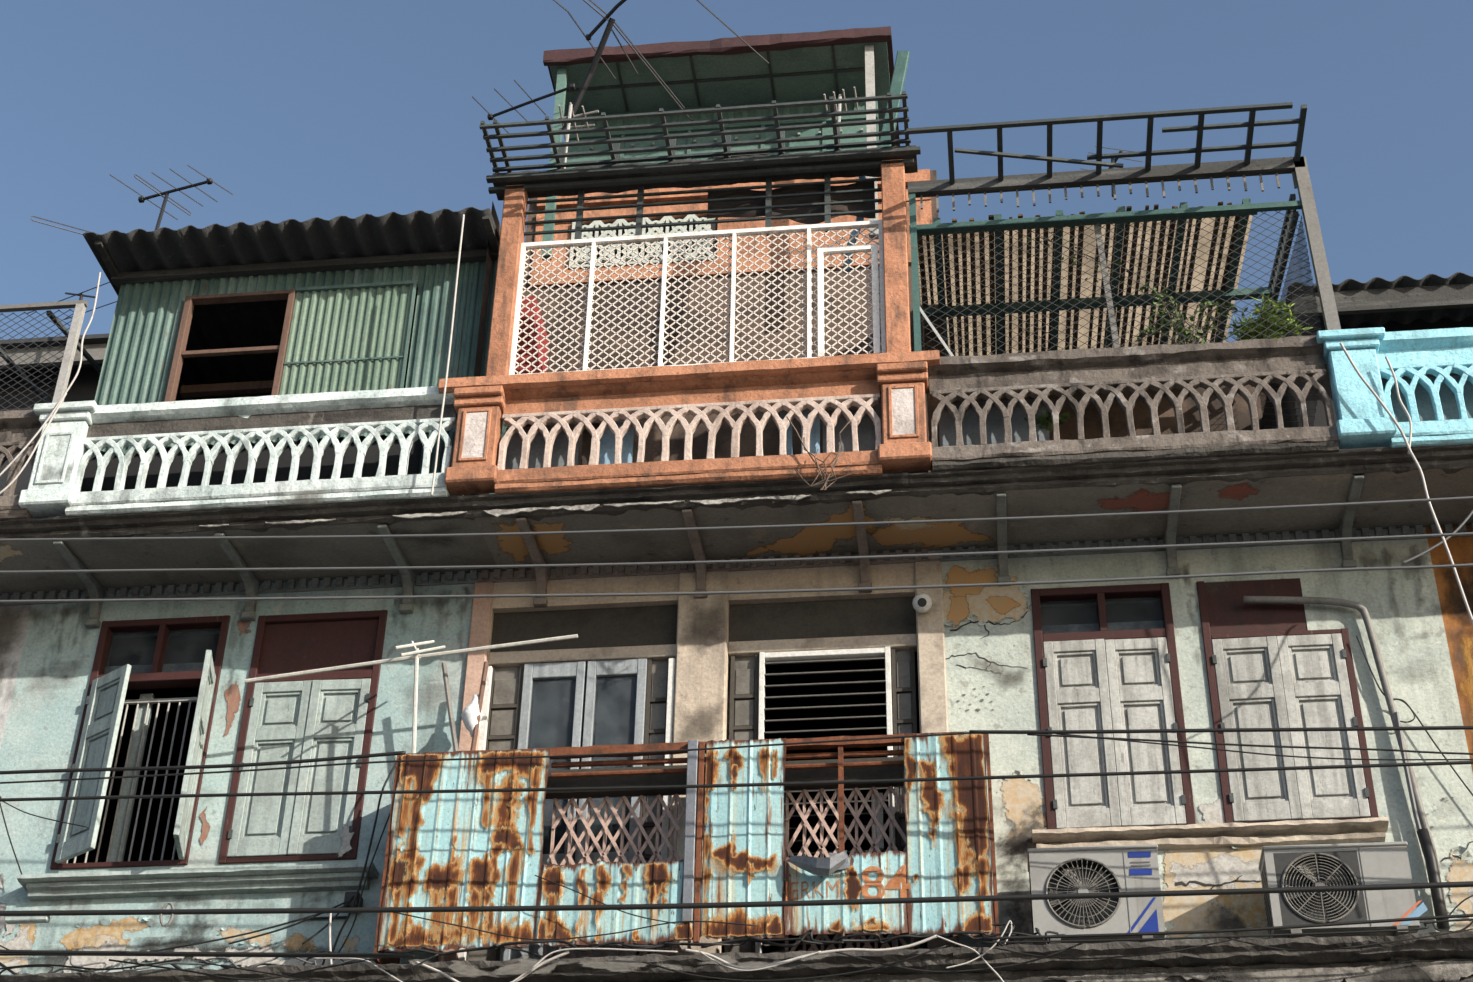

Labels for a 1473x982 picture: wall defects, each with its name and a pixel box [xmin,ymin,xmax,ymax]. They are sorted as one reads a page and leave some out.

peeling [393,495,811,563]
peeling [726,490,993,560]
peeling [943,565,1030,628]
leakage [1444,567,1473,624]
peeling [224,682,241,736]
peeling [200,806,210,845]
corrosion [385,751,673,947]
corrosion [675,743,782,939]
corrosion [904,734,992,932]
peeling [0,873,36,974]
peeling [59,915,376,973]
peeling [1162,845,1269,940]